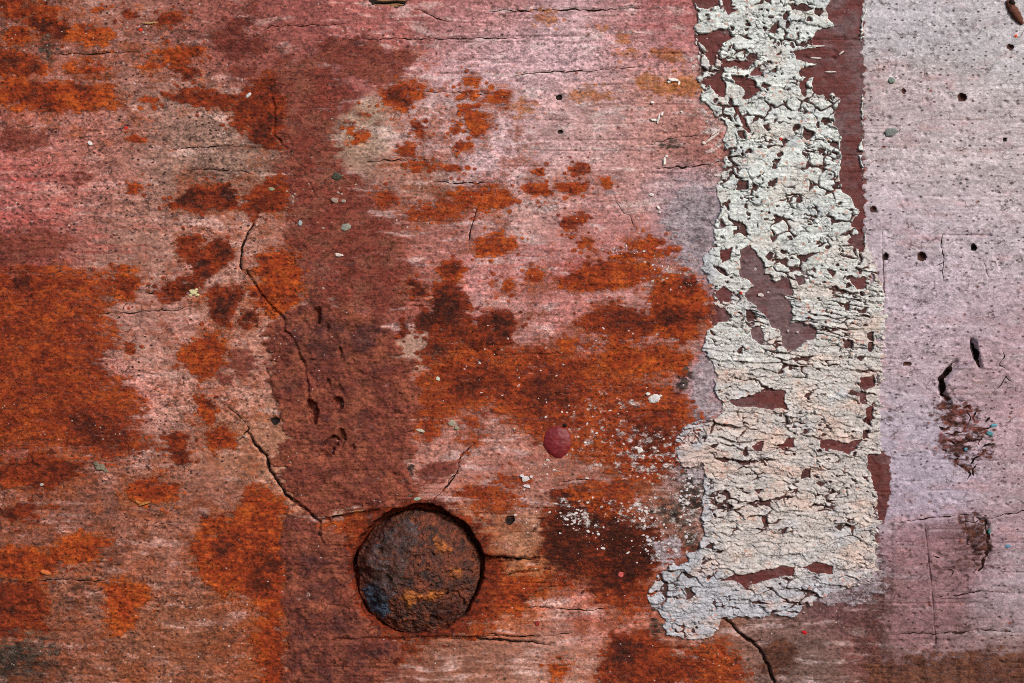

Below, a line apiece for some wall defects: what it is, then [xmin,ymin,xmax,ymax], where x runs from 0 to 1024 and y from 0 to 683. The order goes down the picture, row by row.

rust [0,0,292,225]
rust [530,6,566,30]
rust [0,223,308,645]
crack [239,214,257,286]
crack [221,402,320,535]
rust [316,25,755,683]
peeling [647,0,892,640]
rust [180,476,296,683]
crack [722,618,775,683]